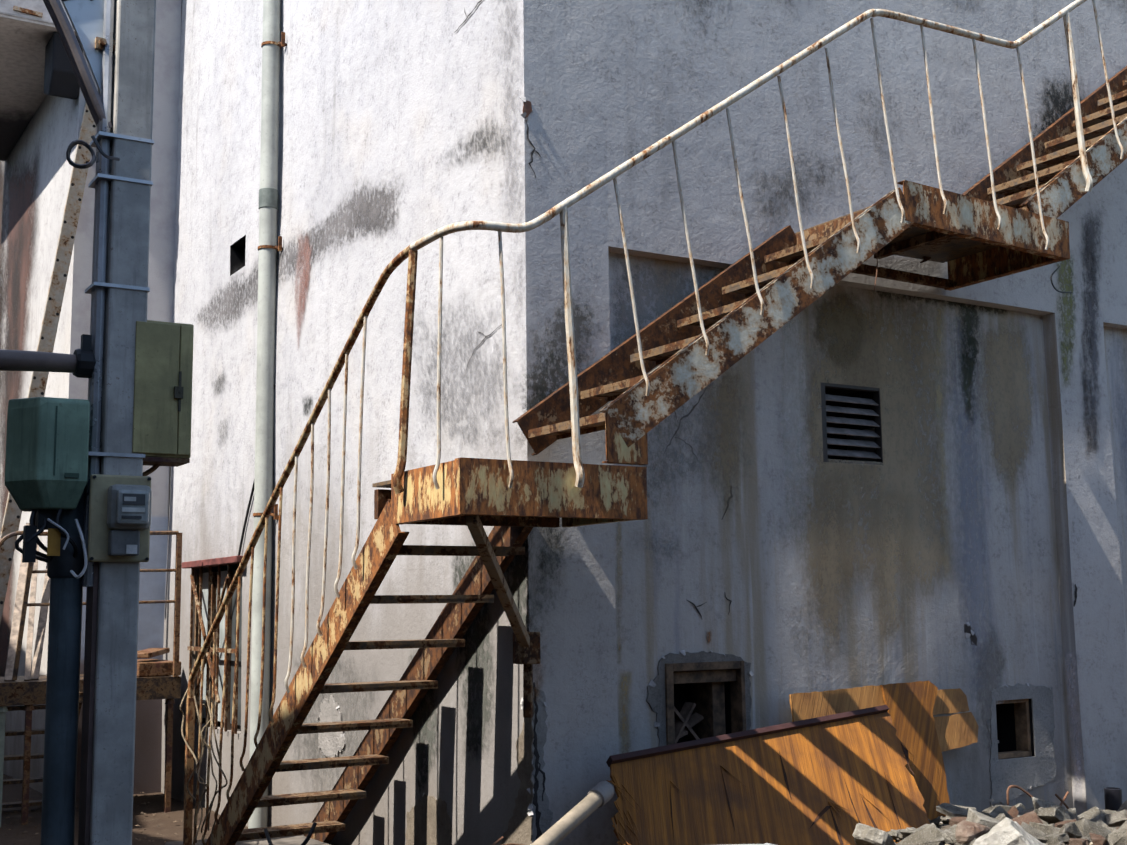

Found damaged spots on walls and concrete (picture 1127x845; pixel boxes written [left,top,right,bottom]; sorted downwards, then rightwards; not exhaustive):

crack [526,120,542,178]
water stain [0,158,38,351]
water stain [200,269,258,326]
rust [295,238,311,340]
water stain [276,188,399,283]
water stain [1061,217,1100,452]
water stain [0,371,23,534]
water stain [783,291,1033,748]
water stain [0,561,13,677]
flaking render [646,650,754,747]